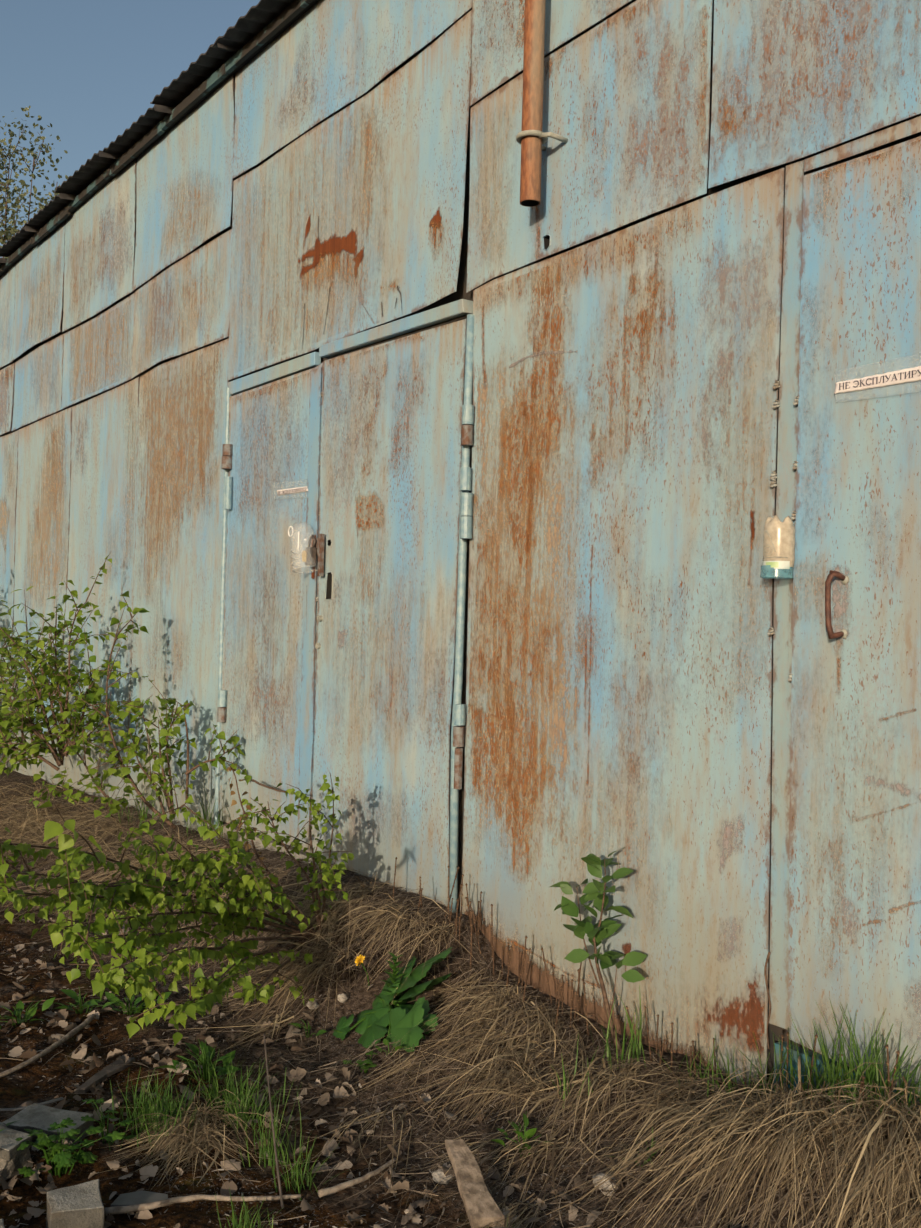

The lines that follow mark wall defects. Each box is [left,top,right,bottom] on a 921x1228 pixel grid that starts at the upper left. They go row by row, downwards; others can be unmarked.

rust [698,85,745,145]
rust [28,228,218,400]
rust [241,114,380,355]
rust [430,208,442,250]
rust [125,359,217,596]
rust [355,356,423,600]
rust [687,982,764,1072]